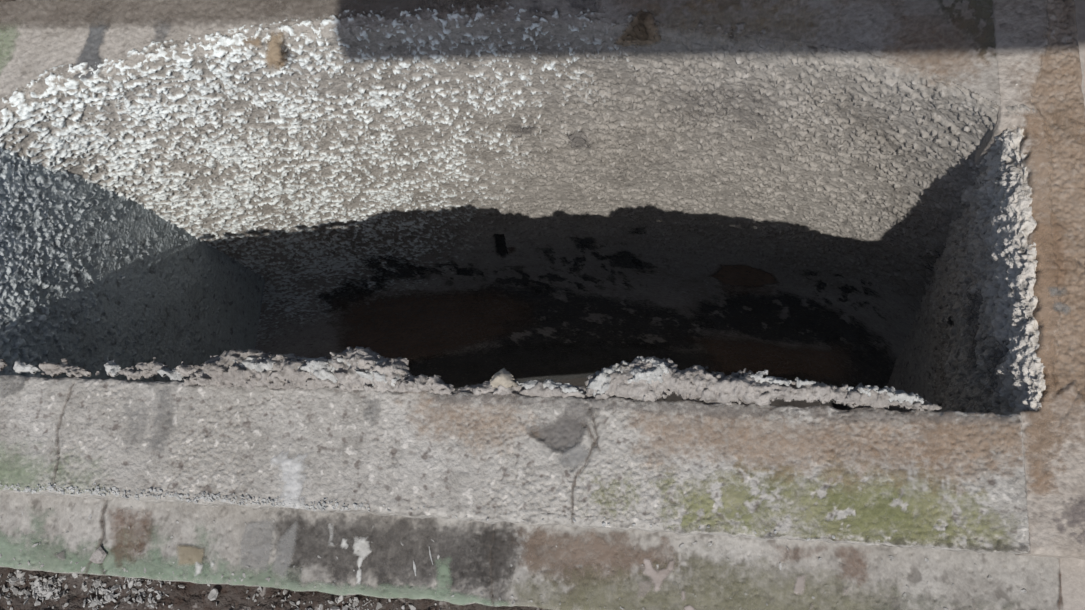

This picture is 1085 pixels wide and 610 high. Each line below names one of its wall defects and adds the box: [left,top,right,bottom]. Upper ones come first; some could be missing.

leakage [319,237,895,402]
crack [572,411,598,516]